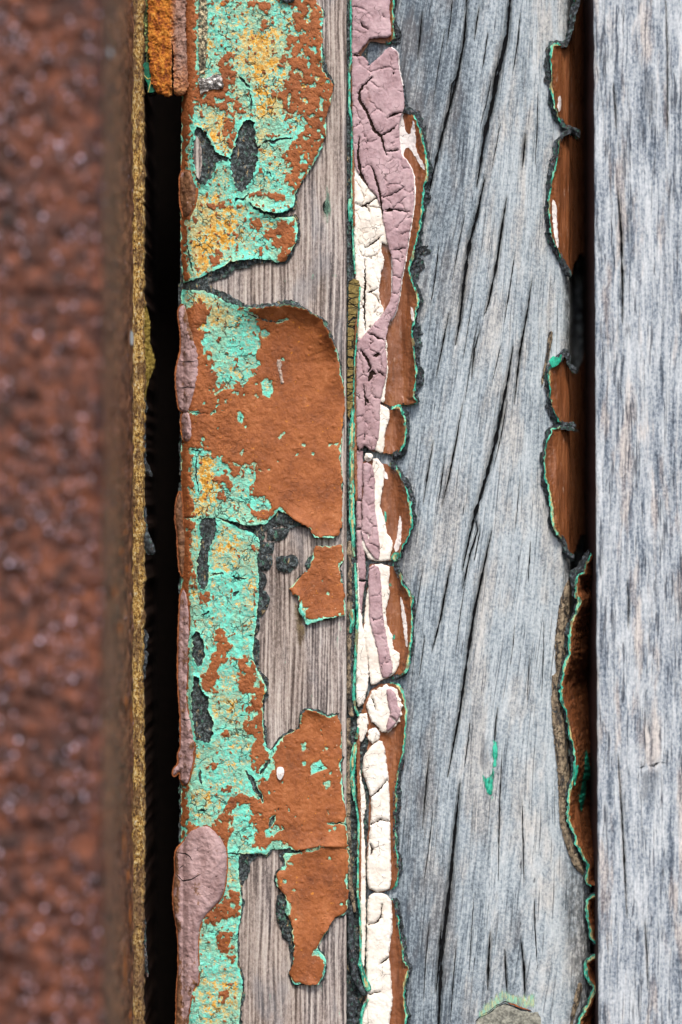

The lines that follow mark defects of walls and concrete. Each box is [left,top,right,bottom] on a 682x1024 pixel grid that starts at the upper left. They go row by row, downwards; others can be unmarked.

peeling [549,354,562,367]
peeling [178,0,360,1024]
crack [415,0,538,1024]
crack [510,626,544,697]
peeling [574,751,590,811]